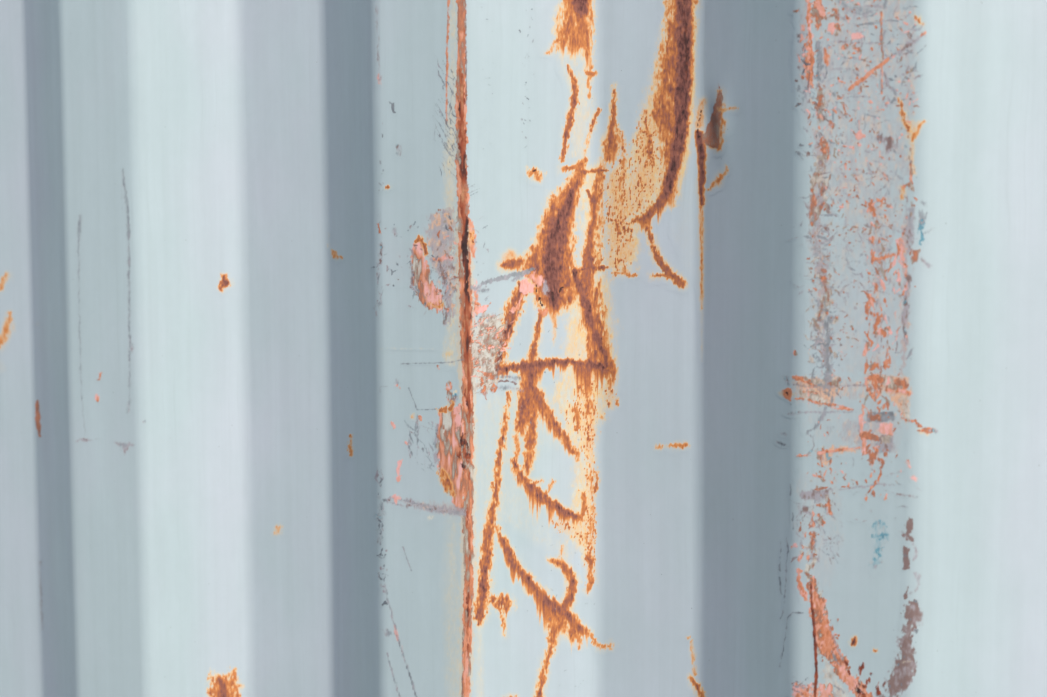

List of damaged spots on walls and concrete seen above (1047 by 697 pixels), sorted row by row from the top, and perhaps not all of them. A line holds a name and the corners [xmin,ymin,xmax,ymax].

rust [0,266,44,376]
rust [32,398,43,439]
rust [215,268,238,296]
peeling [369,0,501,697]
rust [472,0,733,697]
peeling [788,0,935,503]
rust [198,660,249,697]
peeling [785,530,887,697]